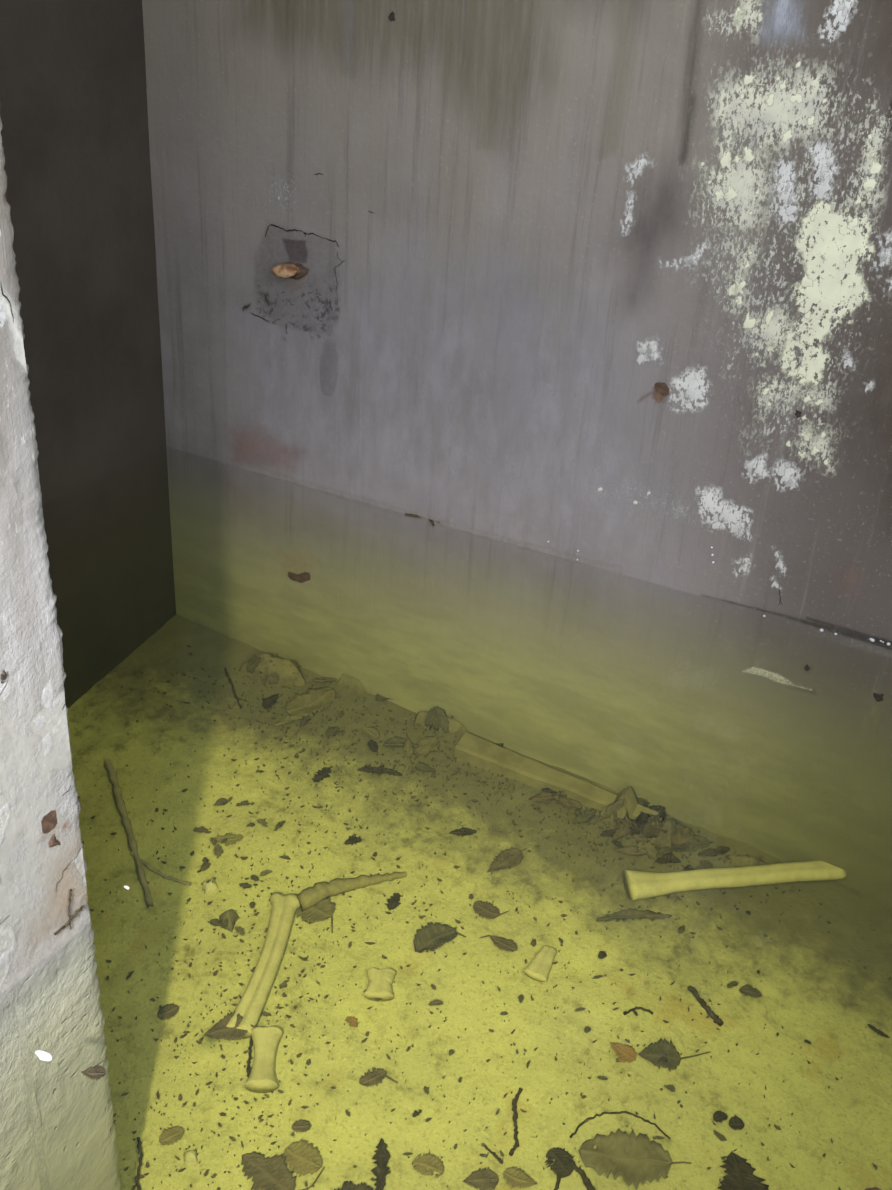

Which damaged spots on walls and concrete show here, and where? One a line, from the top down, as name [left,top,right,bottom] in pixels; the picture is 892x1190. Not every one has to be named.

peeling [594,481,753,541]
peeling [734,557,751,577]